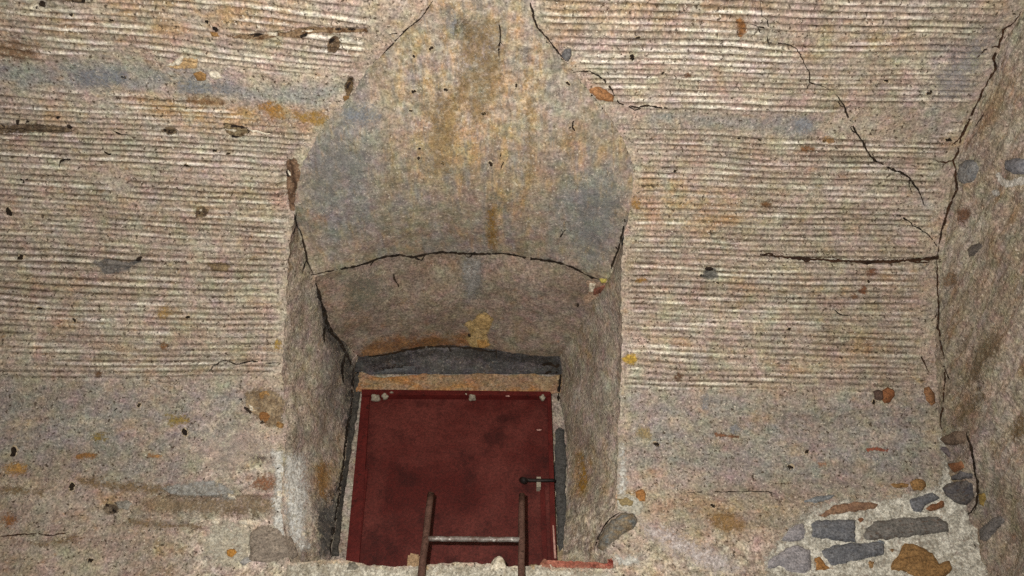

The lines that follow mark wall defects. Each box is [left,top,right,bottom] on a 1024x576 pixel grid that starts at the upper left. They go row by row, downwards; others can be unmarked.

crack [383,1,433,54]
crack [530,3,678,111]
crack [293,212,625,555]
crack [747,2,1021,547]